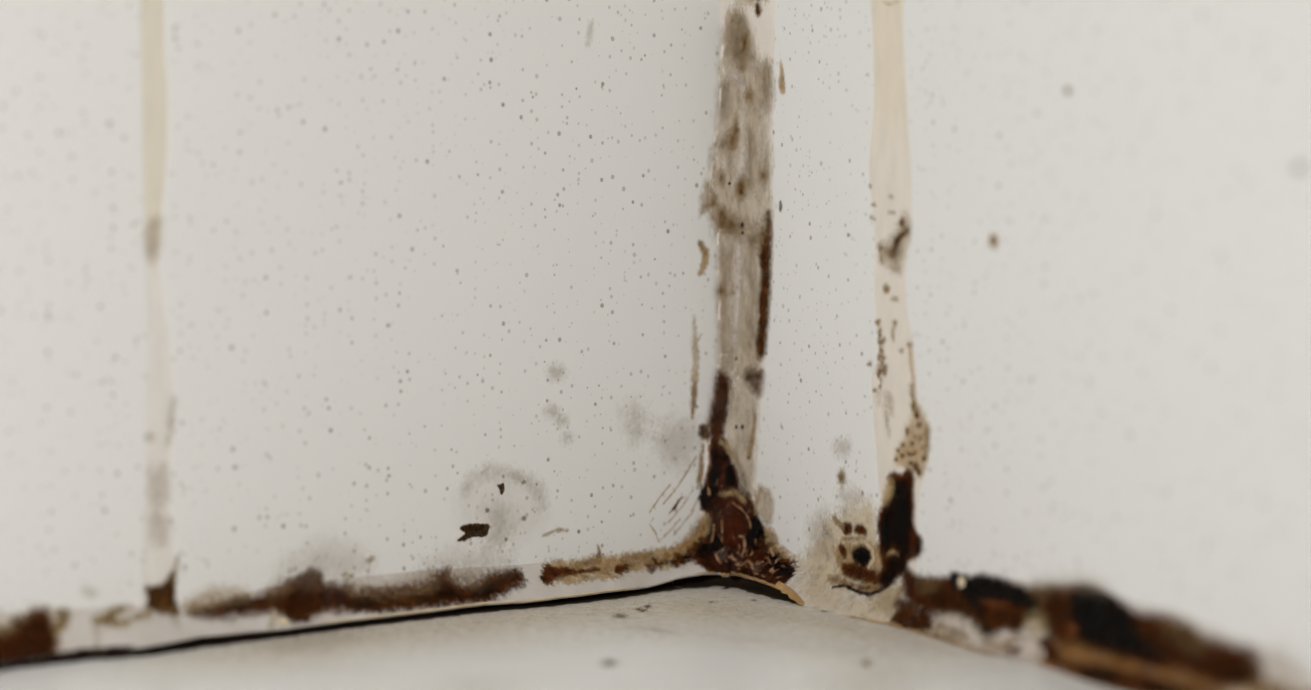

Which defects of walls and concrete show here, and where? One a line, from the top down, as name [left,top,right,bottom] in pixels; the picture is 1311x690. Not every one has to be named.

water stain [540,0,1287,690]
water stain [95,558,524,629]
peeling [775,581,805,606]
water stain [0,609,69,661]